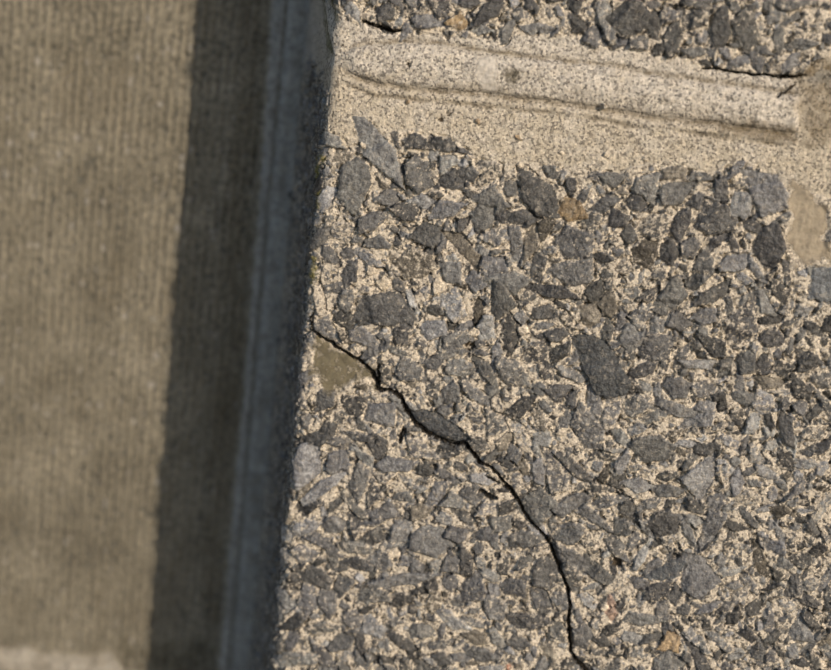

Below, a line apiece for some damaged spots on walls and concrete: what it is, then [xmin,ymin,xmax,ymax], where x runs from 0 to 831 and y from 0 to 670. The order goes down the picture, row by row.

crack [309,313,588,670]